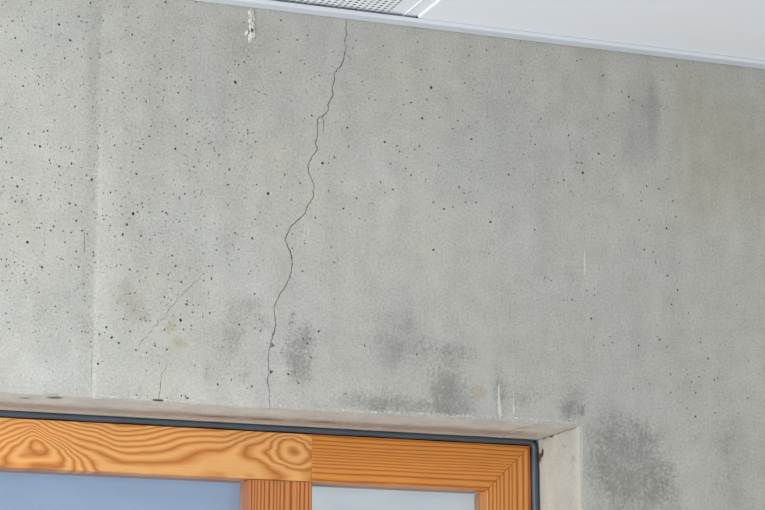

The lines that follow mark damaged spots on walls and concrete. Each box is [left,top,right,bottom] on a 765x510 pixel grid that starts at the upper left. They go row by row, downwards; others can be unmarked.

crack [267,21,347,409]